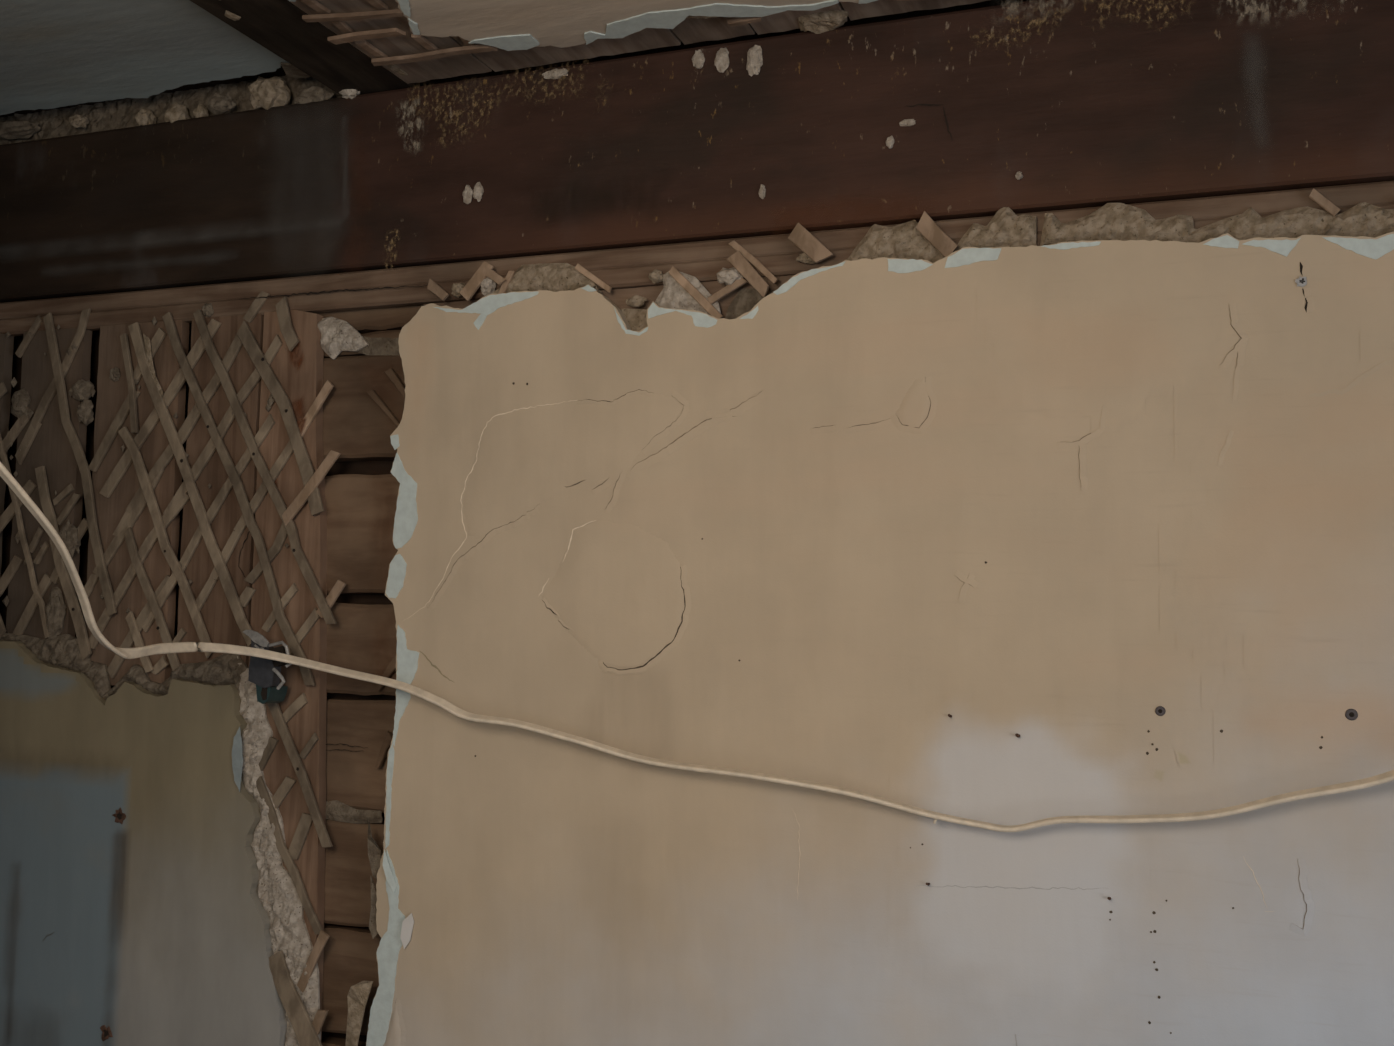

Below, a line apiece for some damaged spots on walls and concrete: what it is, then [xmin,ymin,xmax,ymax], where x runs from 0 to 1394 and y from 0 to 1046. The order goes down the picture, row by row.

peeling [584,0,839,45]
corrosion [1085,0,1184,24]
corrosion [413,66,582,143]
flaking render [434,263,601,330]
flaking render [613,202,1394,336]
crack [1219,303,1249,402]
crack [407,400,577,619]
crack [538,471,627,631]
crack [598,565,692,676]
flaking render [1,633,321,1040]
peeling [345,625,419,1046]
crack [1243,856,1315,937]